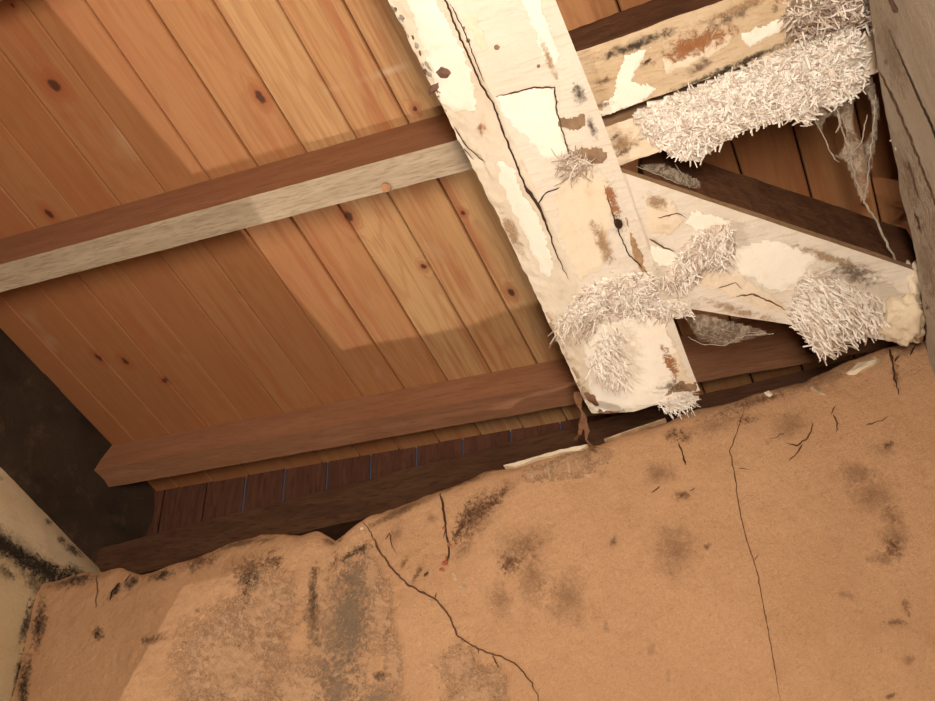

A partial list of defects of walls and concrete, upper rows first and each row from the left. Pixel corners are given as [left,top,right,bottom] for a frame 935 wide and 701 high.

peeling [558,114,585,131]
peeling [577,147,607,166]
crack [878,30,935,235]
peeling [625,217,648,273]
peeling [584,392,620,414]
peeling [665,381,697,396]
crack [889,343,918,394]
leakage [0,535,98,587]
crack [729,405,780,697]
crack [360,492,539,701]
leakage [20,601,47,644]
leakage [12,660,31,701]